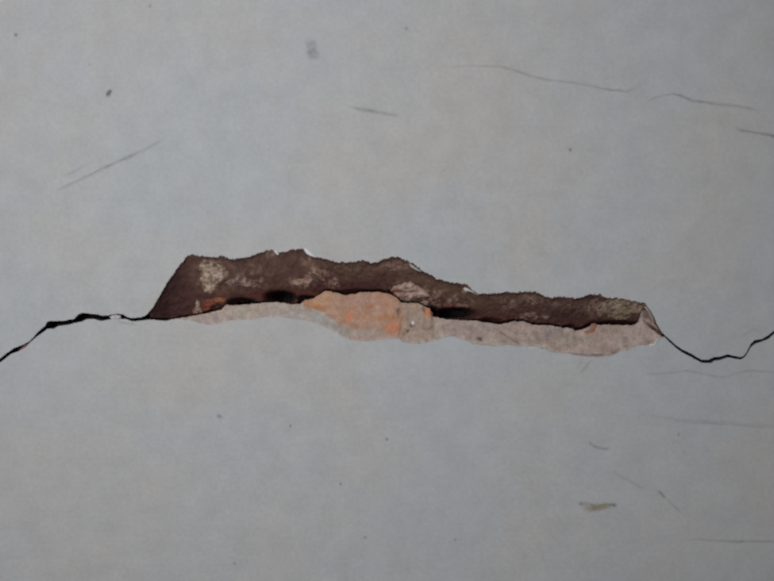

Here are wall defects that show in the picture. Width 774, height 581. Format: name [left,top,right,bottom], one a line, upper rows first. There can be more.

spalling [149,248,662,358]
crack [0,313,152,362]
crack [662,331,774,363]